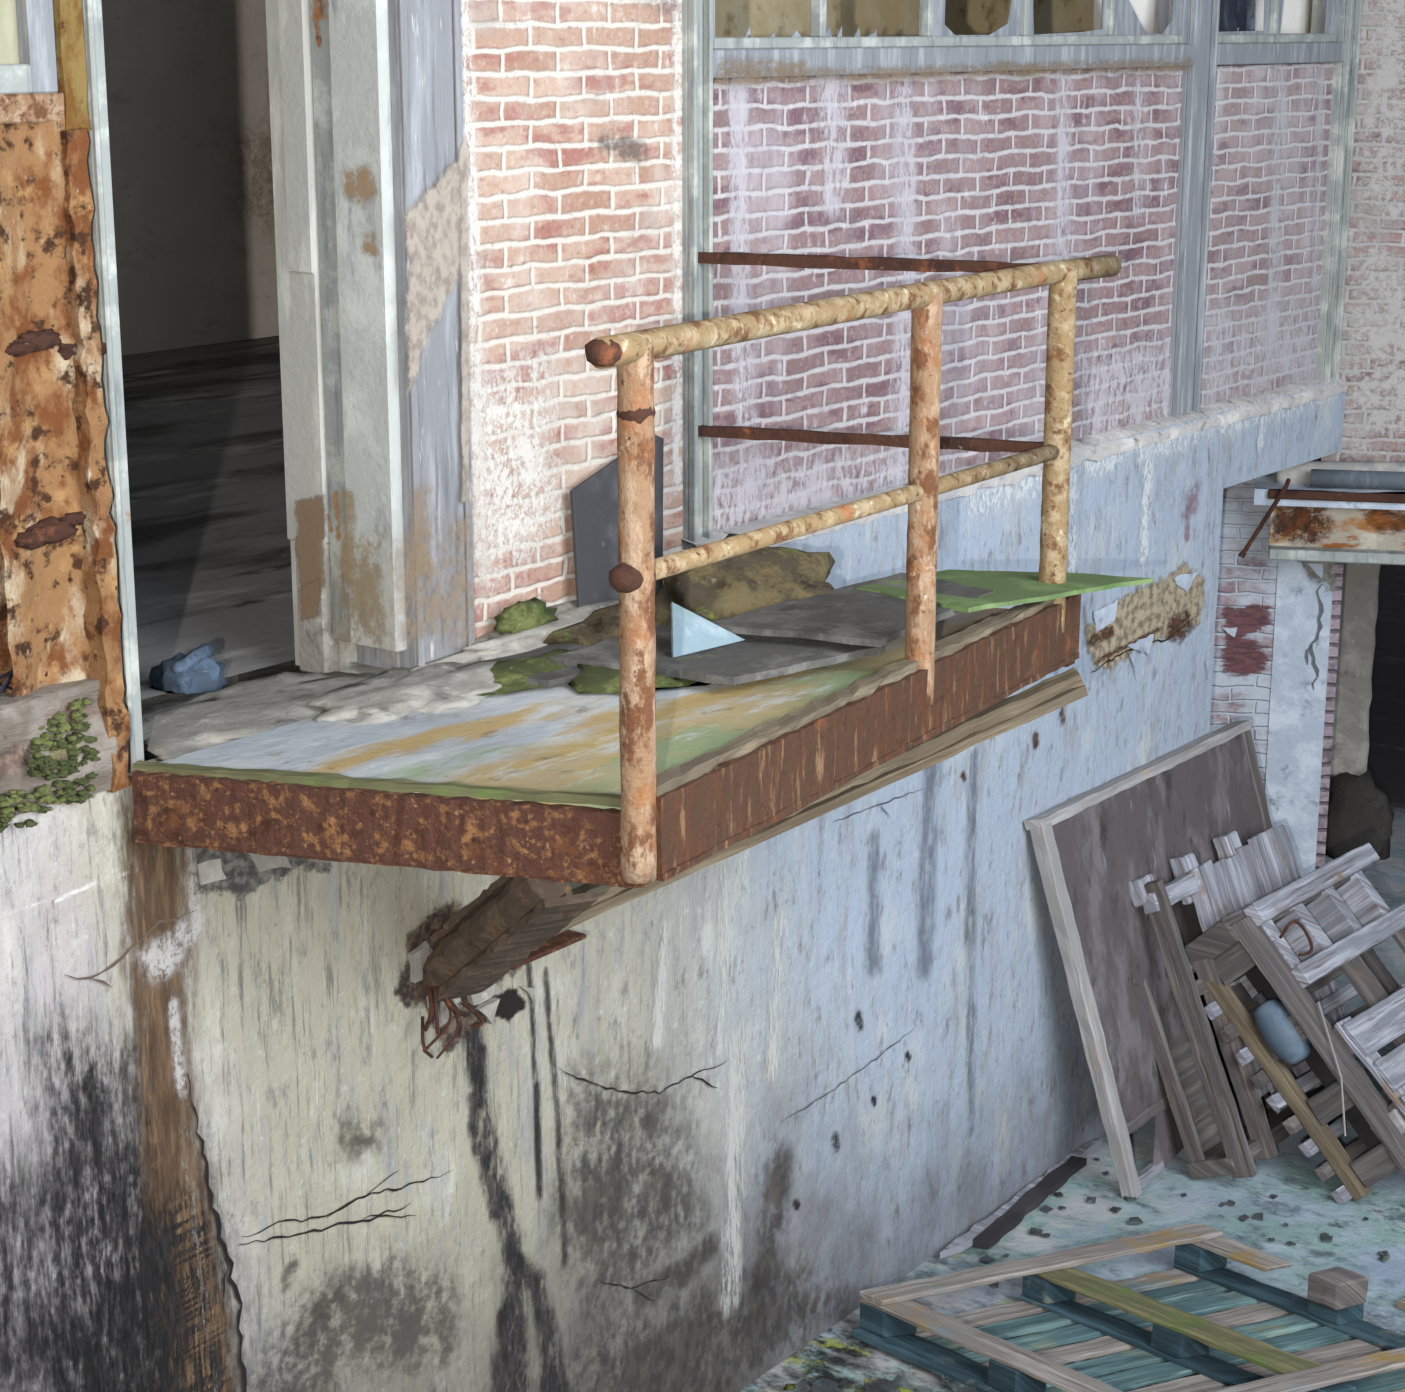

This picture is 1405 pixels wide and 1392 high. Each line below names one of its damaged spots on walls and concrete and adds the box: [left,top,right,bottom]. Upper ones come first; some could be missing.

rust [313,0,325,46]
peeling [405,142,470,502]
water stain [713,310,911,530]
spalling [1085,561,1205,671]
water stain [1068,0,1405,573]
spalling [1220,604,1273,677]
rust [1273,506,1332,543]
rust [1362,509,1405,533]
water stain [0,1024,238,1392]
crack [188,1075,448,1392]
water stain [259,1258,454,1392]
water stain [462,871,832,1392]